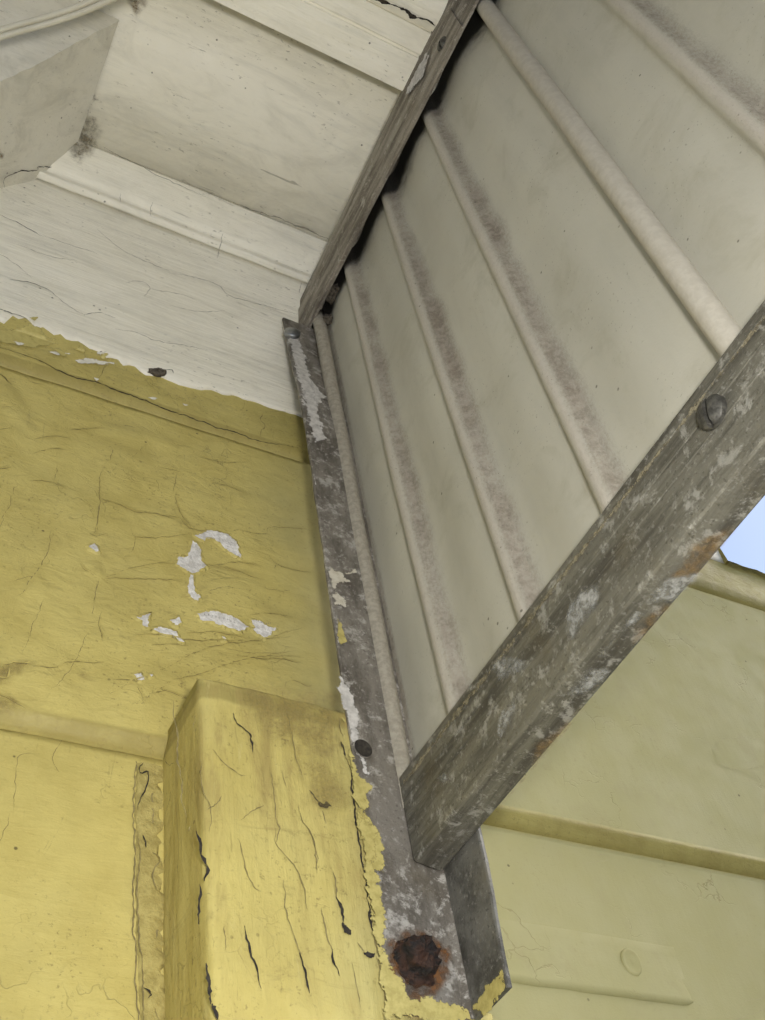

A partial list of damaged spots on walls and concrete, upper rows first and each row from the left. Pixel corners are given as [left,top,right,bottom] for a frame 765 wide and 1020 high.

peeling [0,317,114,365]
peeling [174,529,279,643]
crack [0,346,308,924]
peeling [131,612,186,646]
crack [238,692,386,1007]
crack [206,963,219,1020]
crack [223,925,262,989]
rust [389,931,450,999]